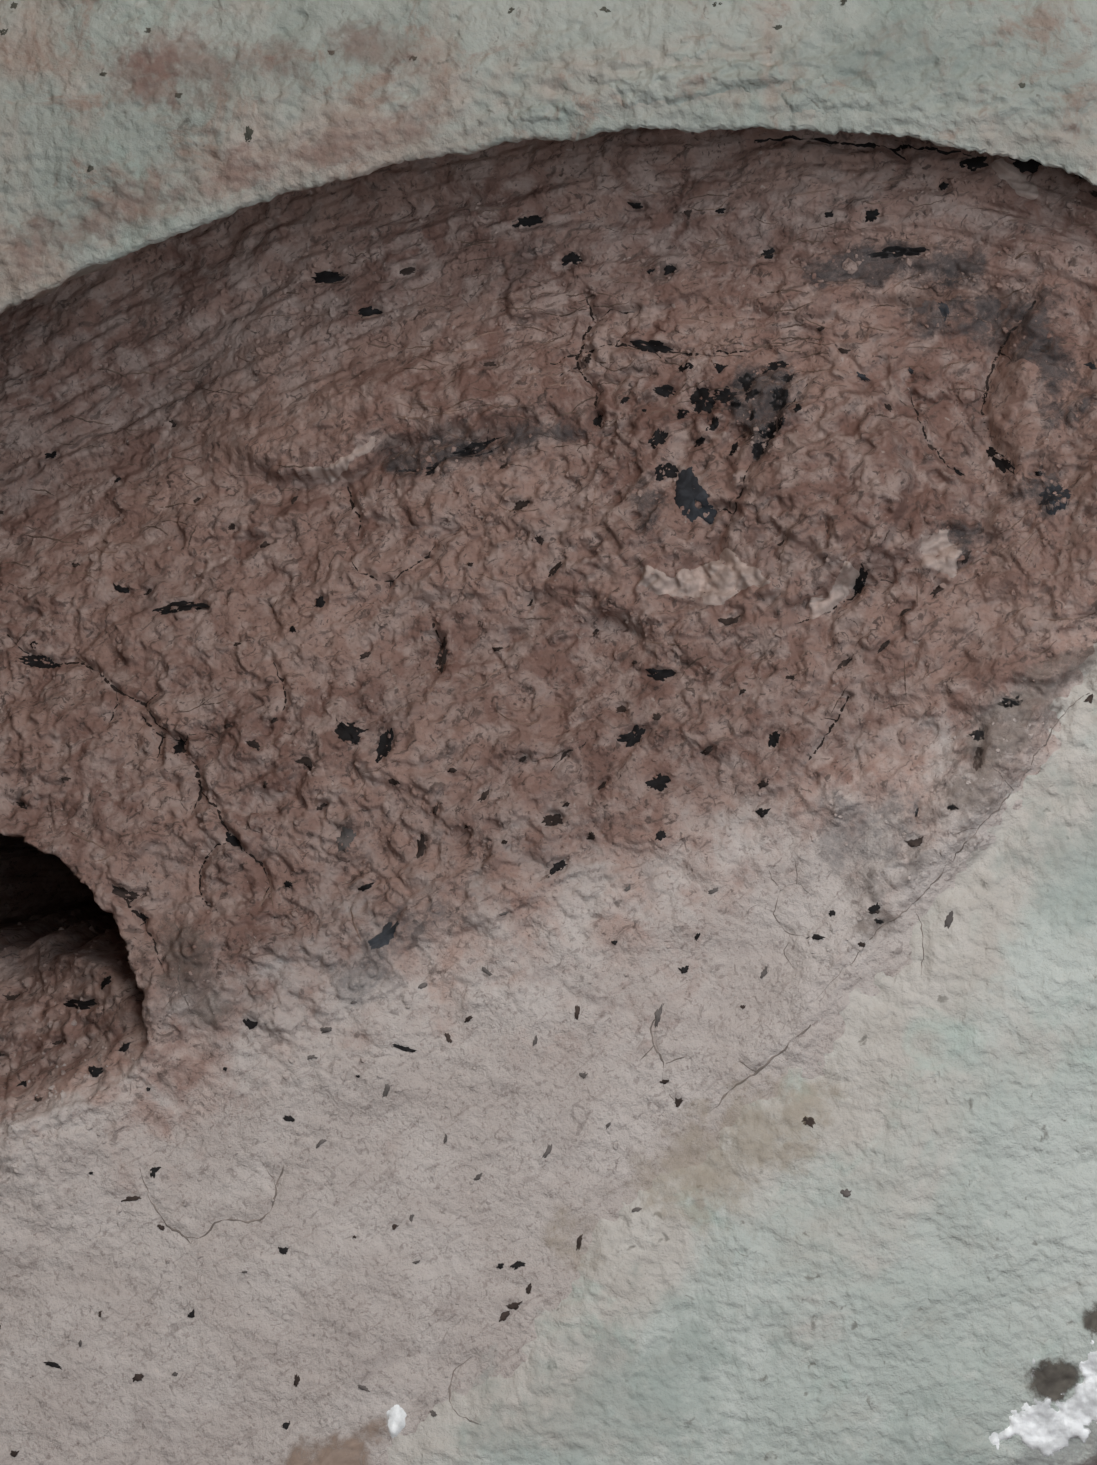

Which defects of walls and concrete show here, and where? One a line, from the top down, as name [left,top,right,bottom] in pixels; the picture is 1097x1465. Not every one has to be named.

peeling [991,158,1039,200]
peeling [302,436,376,483]
peeling [674,466,717,524]
peeling [638,548,771,606]
peeling [808,561,860,619]
peeling [919,528,965,578]
crack [7,634,270,911]
crack [112,884,210,1025]
spalling [0,849,148,1127]
damp [286,1422,387,1465]